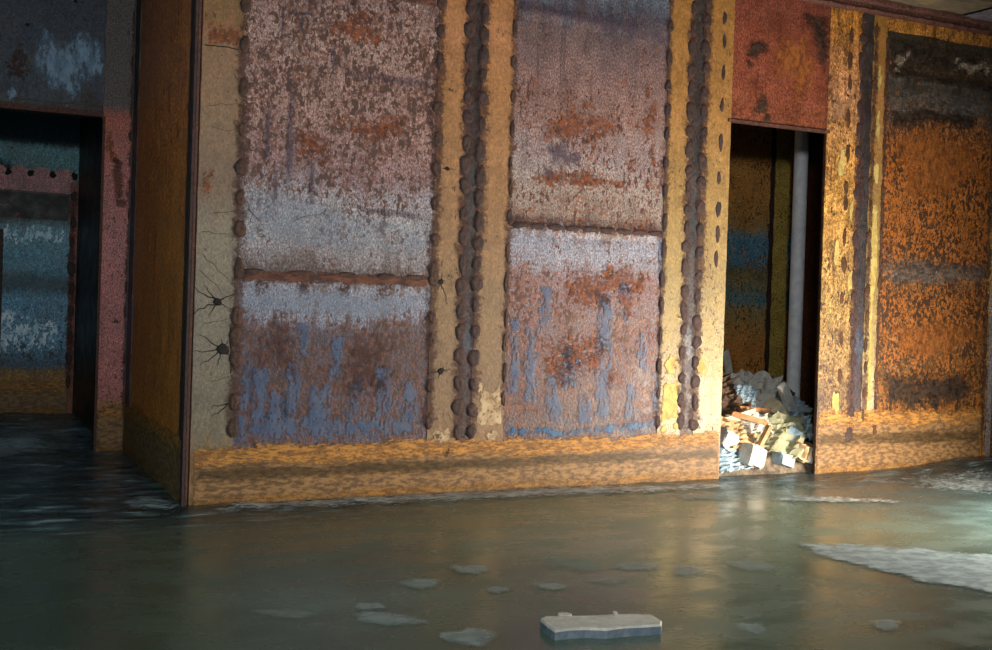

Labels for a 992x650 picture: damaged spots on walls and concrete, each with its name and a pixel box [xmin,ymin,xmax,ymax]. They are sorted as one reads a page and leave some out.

crack [192,209,262,417]
corrosion [208,0,447,438]
corrosion [450,0,494,440]
corrosion [501,0,674,430]
corrosion [677,0,727,431]
water stain [889,40,992,128]
corrosion [981,144,992,428]